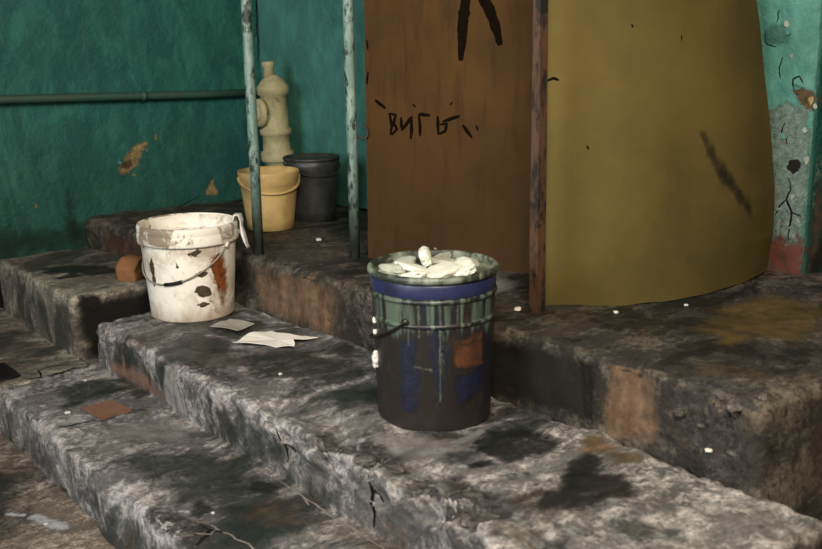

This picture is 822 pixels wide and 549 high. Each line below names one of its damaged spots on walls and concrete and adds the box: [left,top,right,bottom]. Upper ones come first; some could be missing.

peeling [117,135,157,176]
spalling [769,76,822,246]